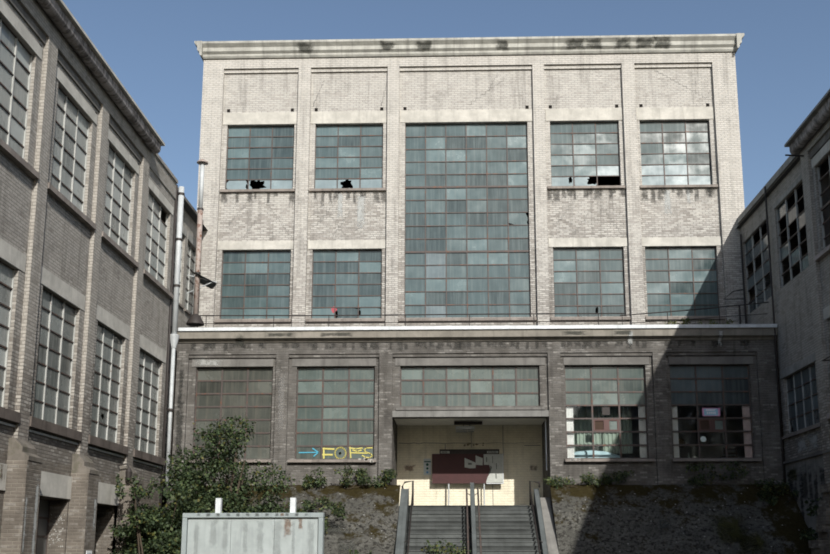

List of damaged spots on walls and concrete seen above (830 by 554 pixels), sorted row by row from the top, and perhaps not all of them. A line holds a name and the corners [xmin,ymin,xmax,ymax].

water stain [566,39,601,48]
water stain [616,37,670,48]